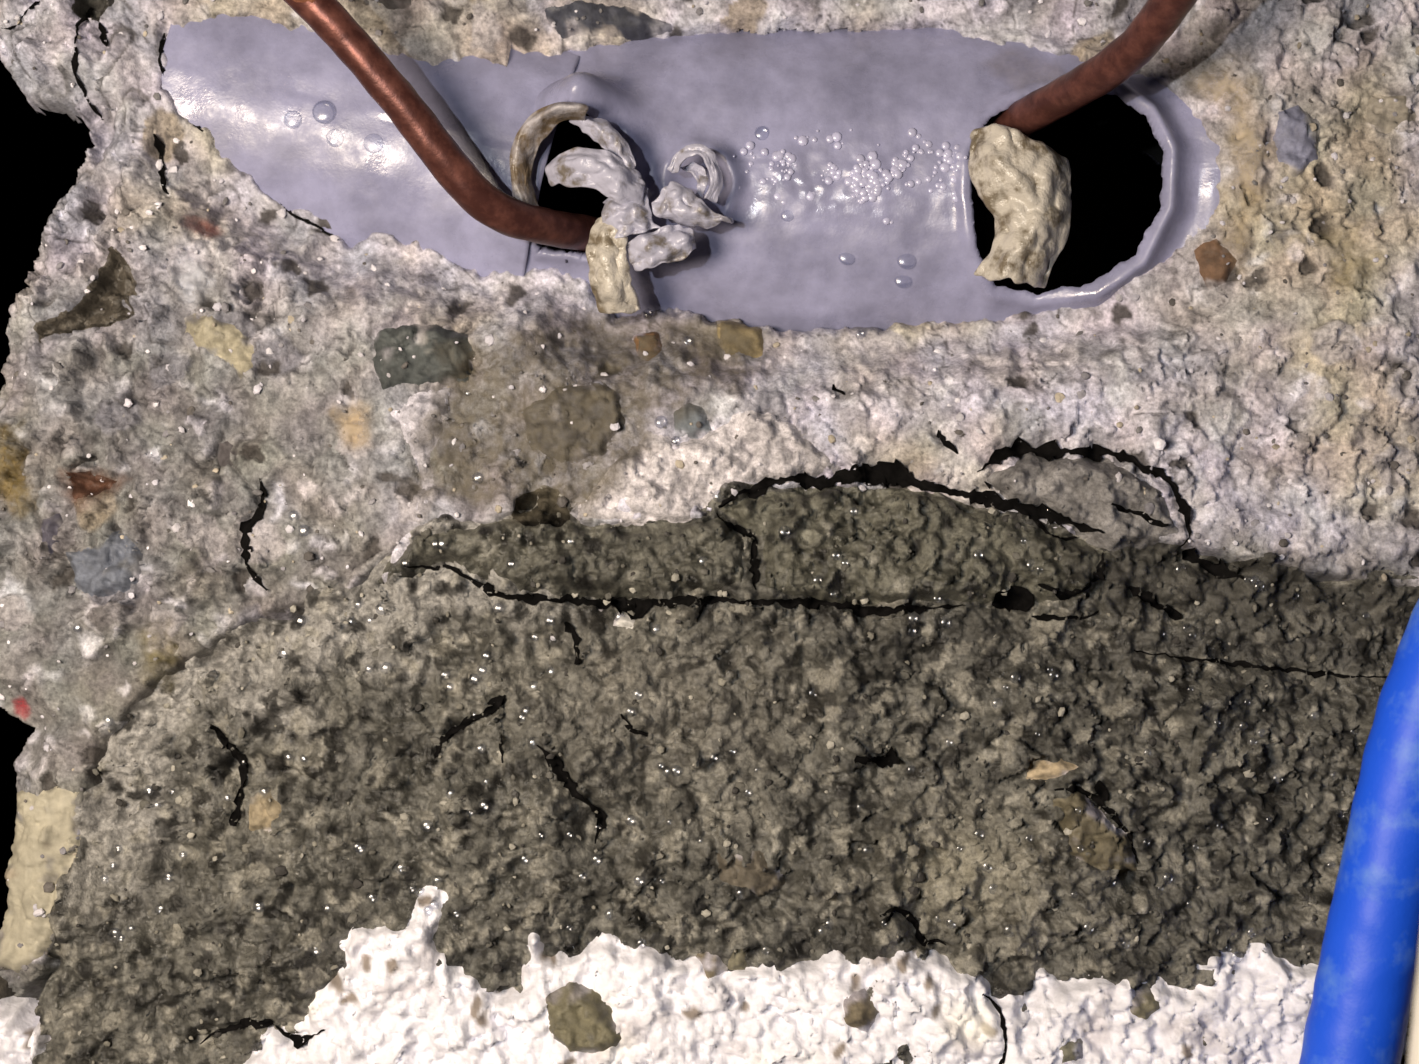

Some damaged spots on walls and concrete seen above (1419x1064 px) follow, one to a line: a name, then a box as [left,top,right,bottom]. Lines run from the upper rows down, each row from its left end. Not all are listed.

crack [2,1,40,30]
crack [71,7,108,120]
spalling [0,60,95,391]
spalling [986,212,995,257]
spalling [993,145,1163,295]
crack [239,478,267,591]
leakage [408,321,751,544]
crack [403,430,1244,665]
spalling [987,453,1179,551]
crack [1134,650,1387,679]
spalling [0,707,35,929]
leakage [32,481,1419,1064]